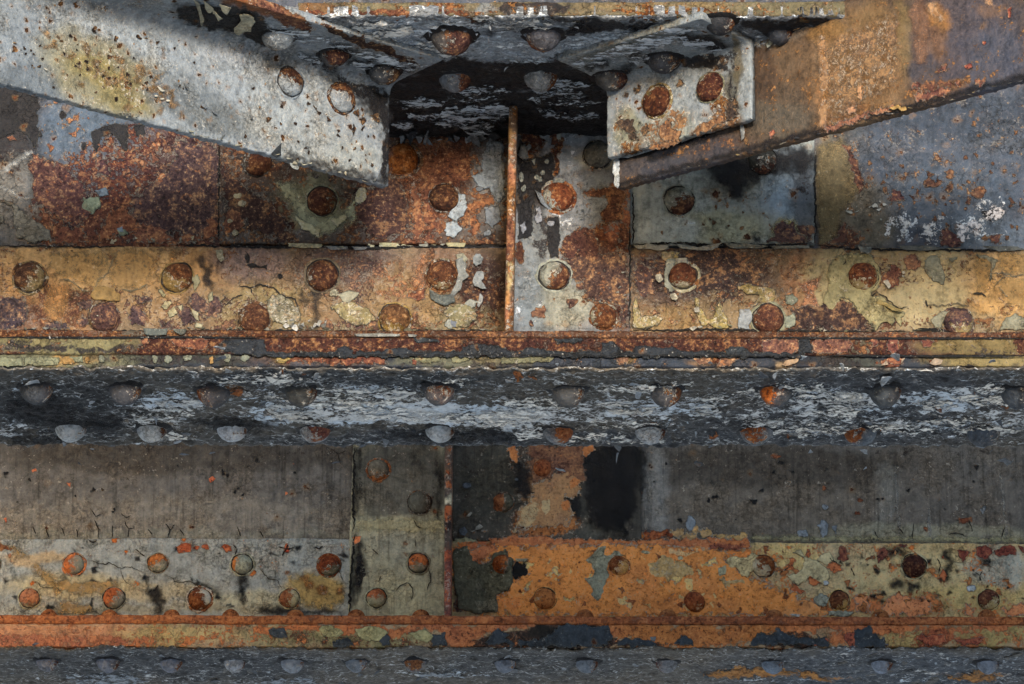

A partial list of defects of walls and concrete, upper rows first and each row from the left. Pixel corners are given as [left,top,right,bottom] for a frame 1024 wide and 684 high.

rust [25,135,302,247]
spalling [307,102,380,183]
peeling [209,130,813,390]
rust [560,186,657,328]
rust [881,152,986,262]
rust [0,296,29,330]
peeling [143,289,205,336]
rust [126,292,223,350]
rust [761,276,899,354]
peeling [880,353,905,387]
peeling [452,512,528,615]
rust [468,445,949,650]